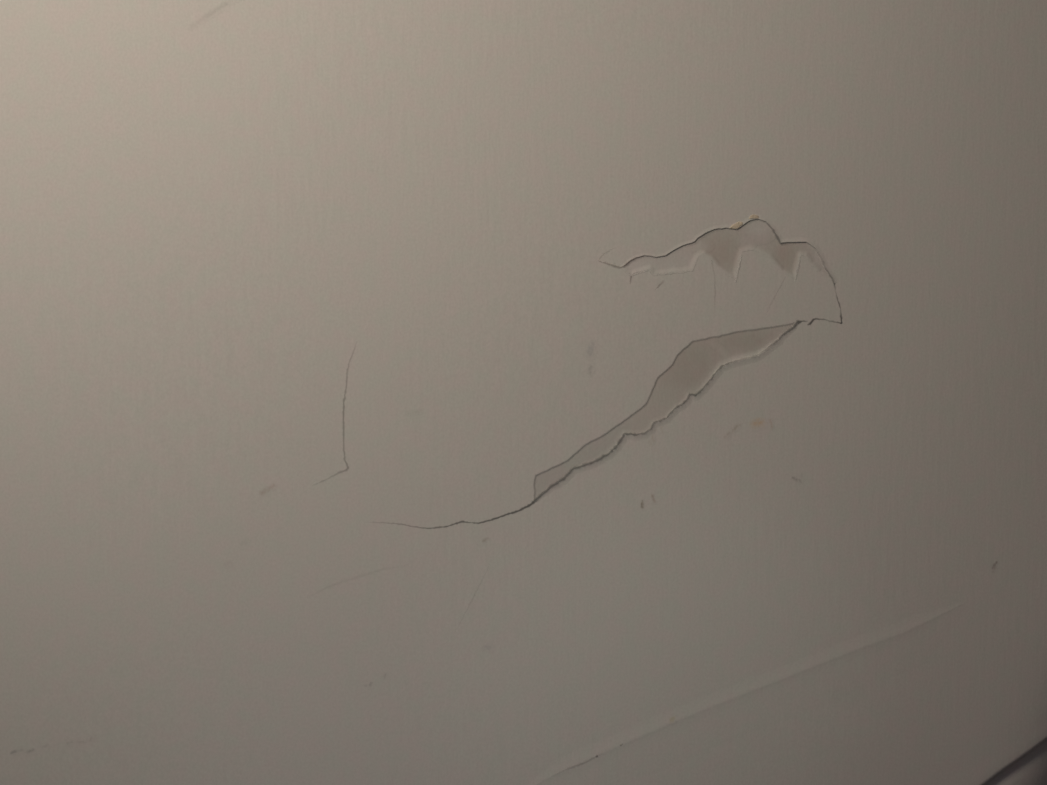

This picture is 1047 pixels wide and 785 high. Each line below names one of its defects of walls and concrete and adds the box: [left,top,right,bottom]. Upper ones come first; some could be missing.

peeling [598,215,837,284]
peeling [533,321,799,503]
crack [446,501,535,527]